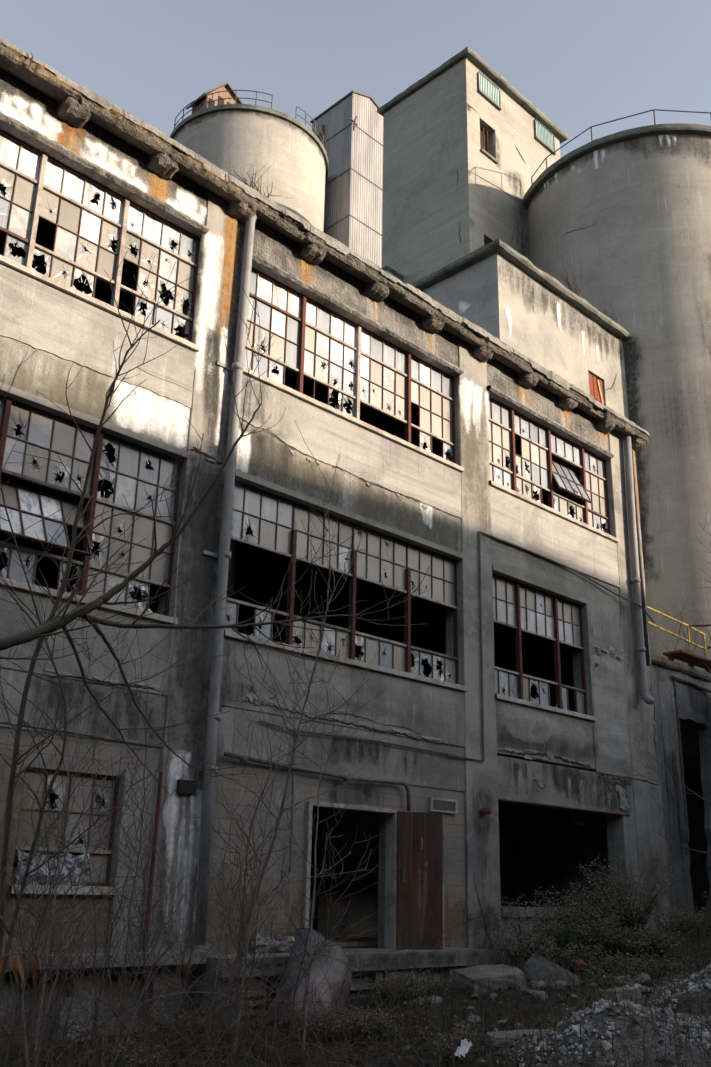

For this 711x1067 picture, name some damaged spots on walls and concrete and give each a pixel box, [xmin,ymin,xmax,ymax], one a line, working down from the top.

corrosion [58,120,85,150]
water stain [83,125,147,193]
corrosion [150,172,169,202]
water stain [174,110,325,165]
corrosion [221,215,238,329]
water stain [0,347,190,448]
water stain [167,176,458,552]
water stain [505,265,642,428]
water stain [635,449,657,577]
water stain [152,459,255,945]